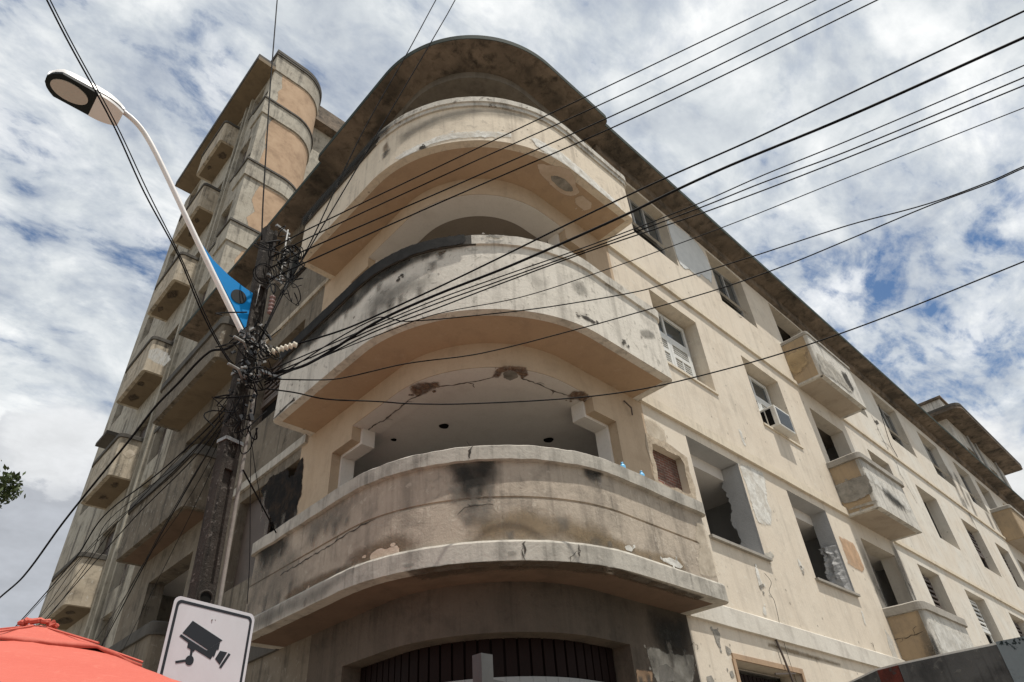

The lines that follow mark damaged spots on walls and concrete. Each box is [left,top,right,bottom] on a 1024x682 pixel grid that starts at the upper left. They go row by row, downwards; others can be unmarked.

spalling [409,382,439,396]
crack [368,377,493,430]
spalling [493,366,528,380]
spalling [565,391,589,402]
damp [451,461,495,499]
damp [586,469,602,486]
spalling [721,463,772,594]
spalling [306,543,399,590]
peeling [660,556,683,569]
peeling [644,645,696,682]